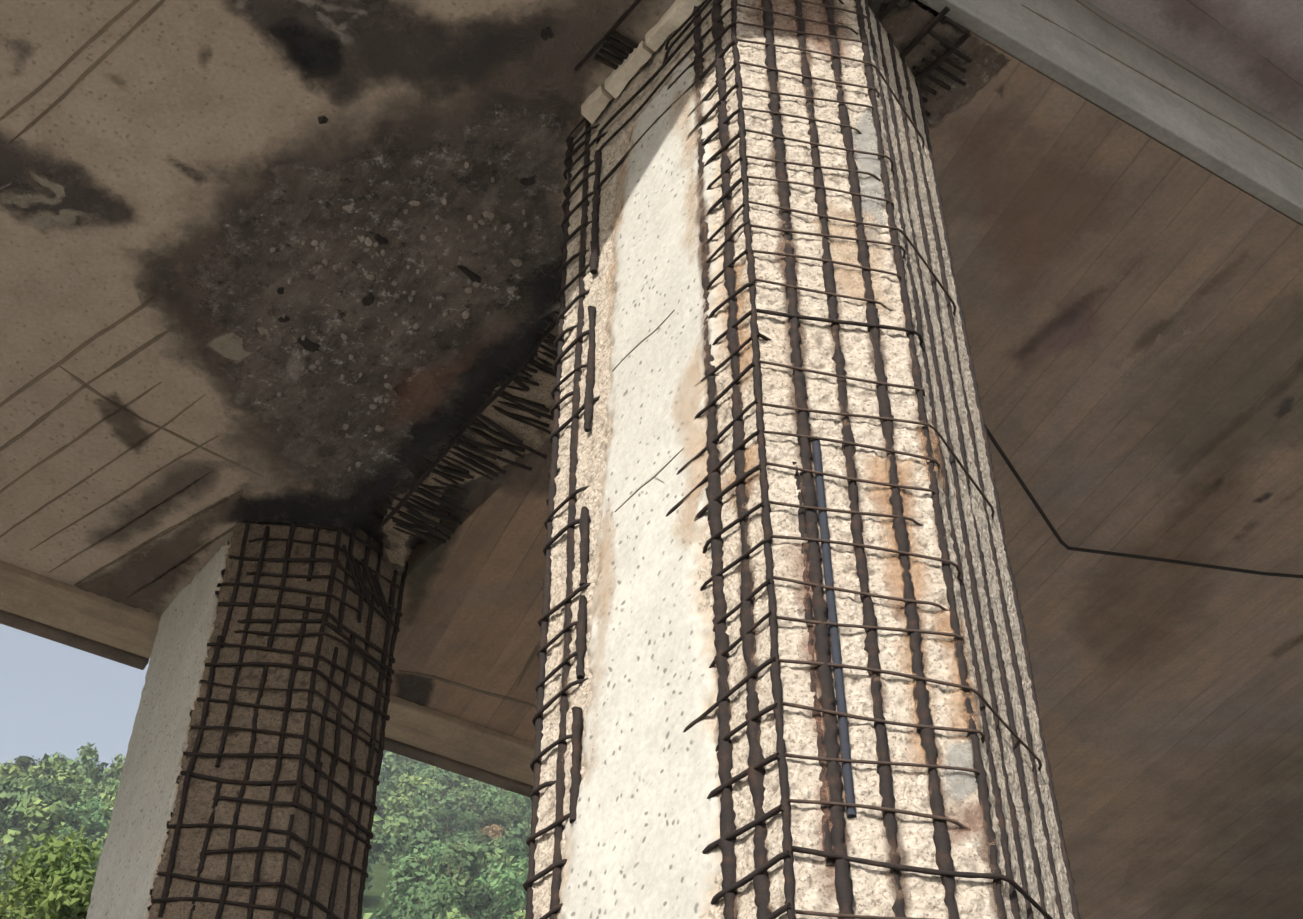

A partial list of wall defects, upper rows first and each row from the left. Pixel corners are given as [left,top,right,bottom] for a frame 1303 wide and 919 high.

water stain [231,0,647,168]
corrosion [783,0,846,125]
water stain [0,137,132,230]
corrosion [688,166,709,381]
corrosion [736,293,748,359]
corrosion [817,212,902,308]
water stain [78,416,365,614]
spalling [139,0,1081,919]
corrosion [681,391,717,534]
corrosion [716,450,760,688]
corrosion [846,435,925,663]
corrosion [938,615,976,723]